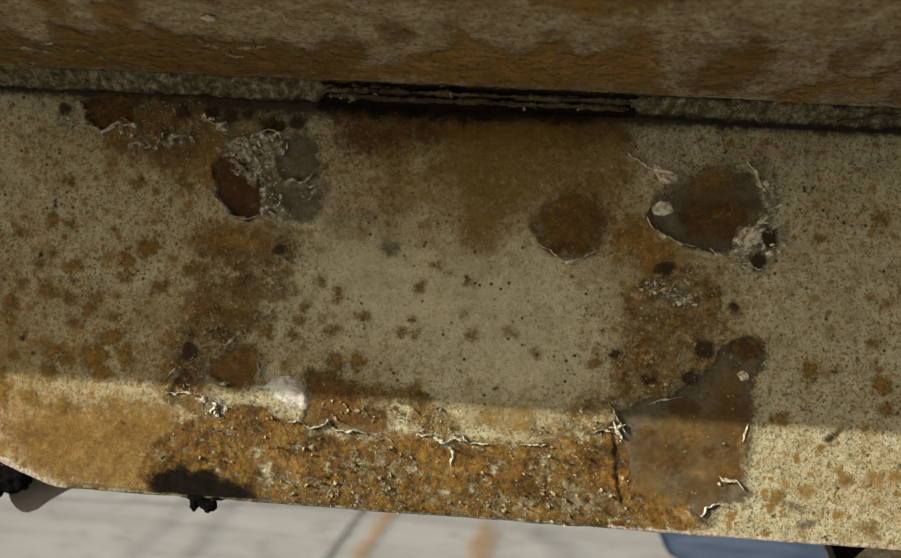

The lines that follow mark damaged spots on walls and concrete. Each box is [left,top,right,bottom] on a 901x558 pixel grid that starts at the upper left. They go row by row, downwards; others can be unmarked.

peeling [56,92,329,226]
rust [45,208,78,229]
rust [118,238,159,283]
peeling [529,188,612,265]
peeling [627,153,789,271]
rust [2,276,103,327]
rust [42,314,134,383]
rust [324,352,367,371]
peeling [530,261,770,531]
rust [3,390,699,531]
peeling [348,447,428,511]
peeling [438,464,581,524]